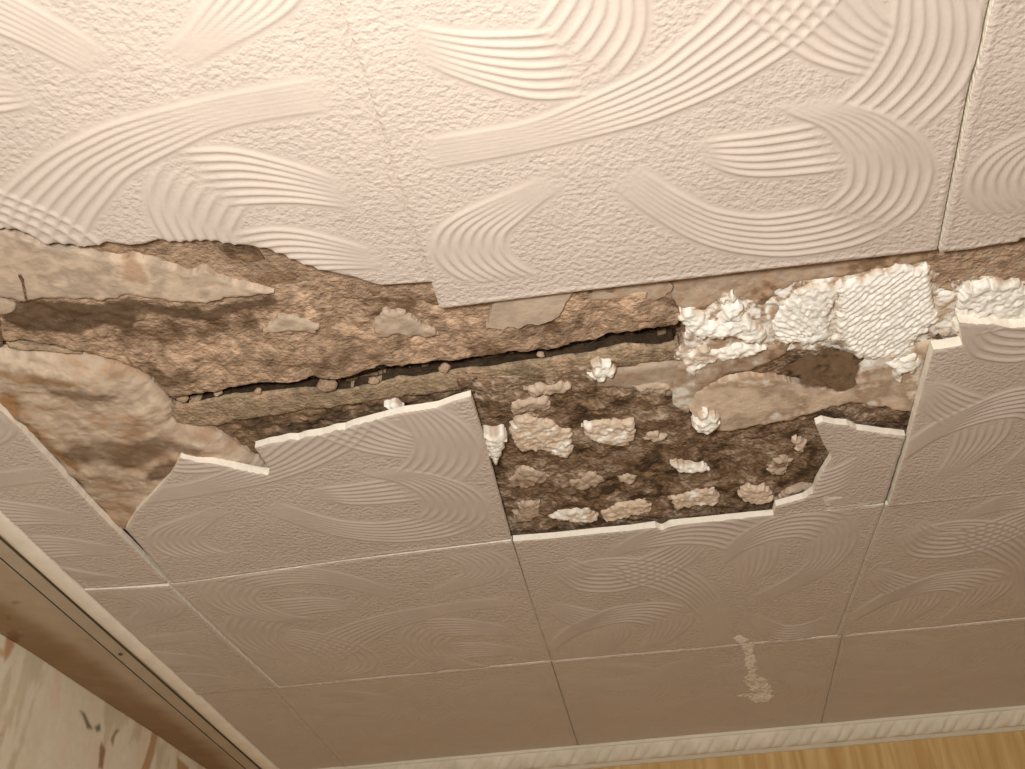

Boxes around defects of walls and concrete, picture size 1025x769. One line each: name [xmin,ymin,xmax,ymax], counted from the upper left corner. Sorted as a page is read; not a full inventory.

water stain [3,298,277,334]
crack [0,339,83,354]
crack [169,325,674,404]
spalling [0,227,1025,538]
water stain [148,462,176,480]